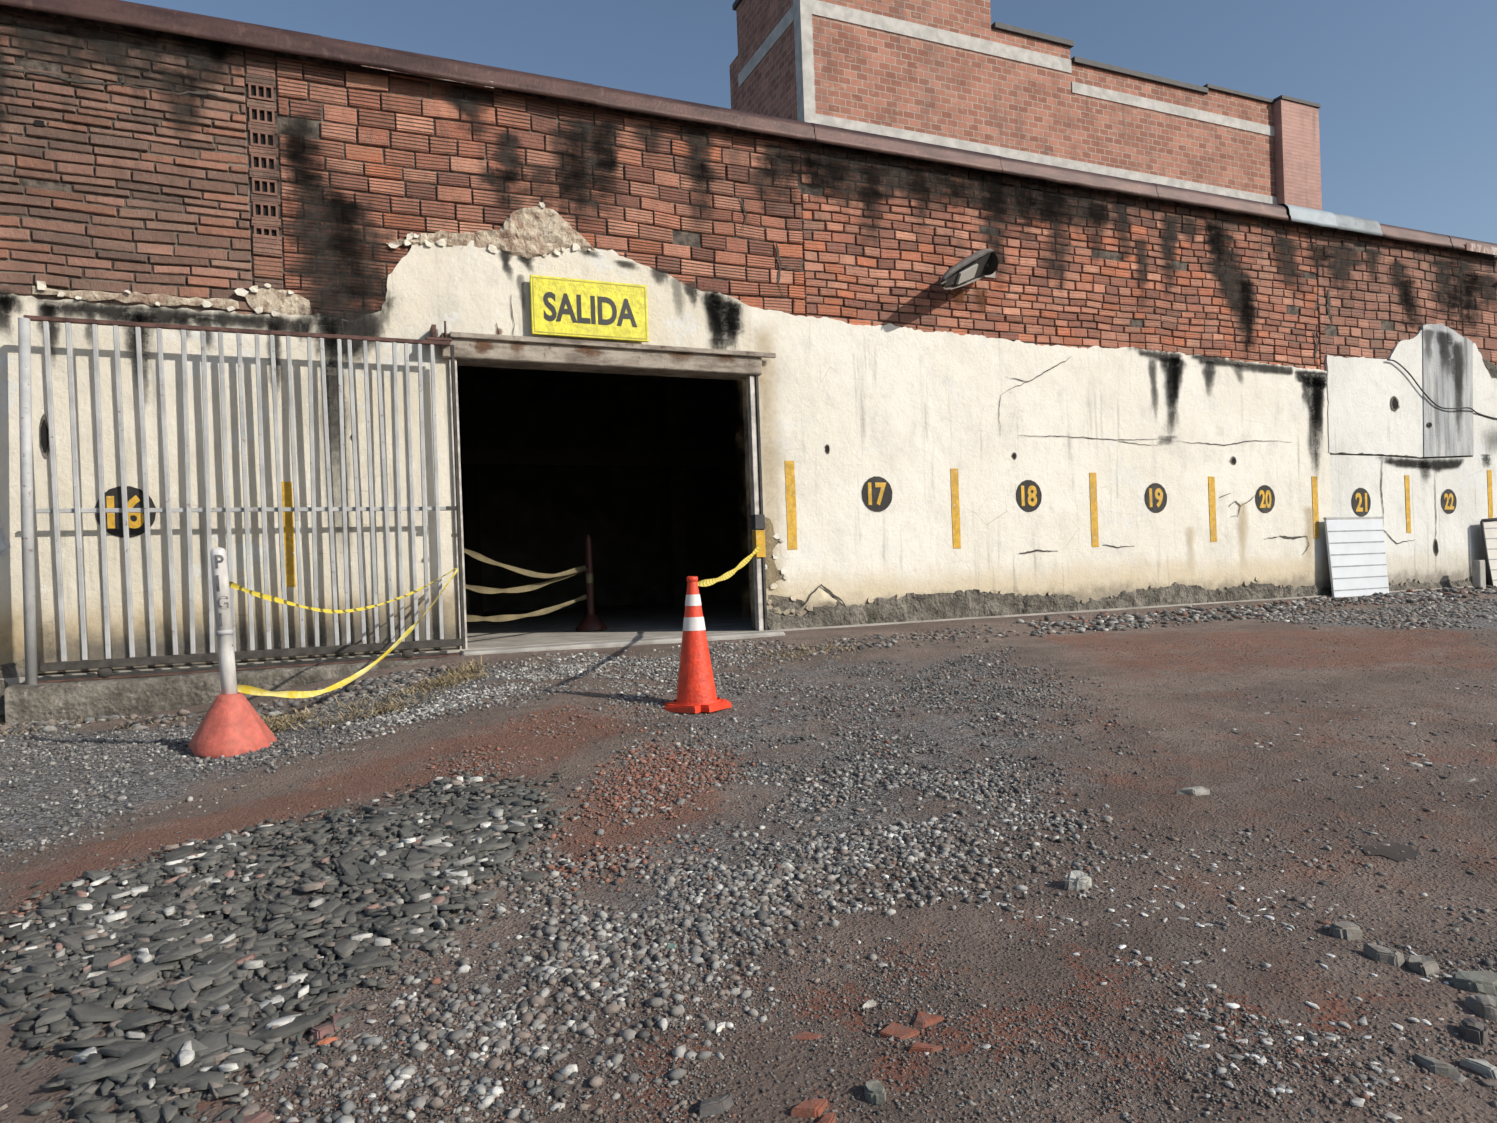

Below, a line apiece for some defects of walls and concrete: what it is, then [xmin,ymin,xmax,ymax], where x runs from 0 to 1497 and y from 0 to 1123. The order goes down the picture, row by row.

damp [441,86,620,210]
damp [0,289,21,328]
peeling [37,281,82,300]
damp [39,114,393,485]
peeling [201,283,294,317]
spalling [386,202,596,259]
damp [501,250,532,272]
damp [685,281,742,349]
damp [751,139,1327,465]
damp [1271,237,1497,423]
crack [999,358,1289,446]
spalling [764,517,1329,630]